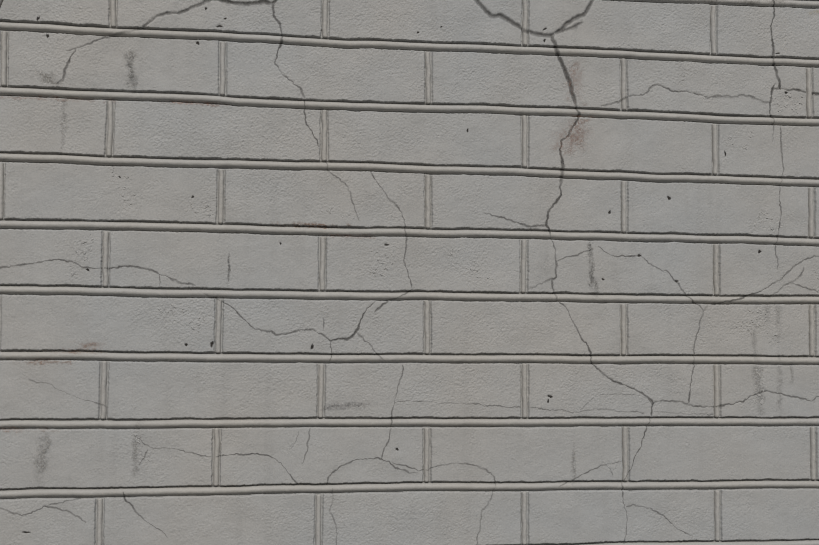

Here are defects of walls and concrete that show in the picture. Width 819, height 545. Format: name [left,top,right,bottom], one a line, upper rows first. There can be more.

crack [219,0,277,20]
crack [771,5,819,95]
crack [330,303,386,357]